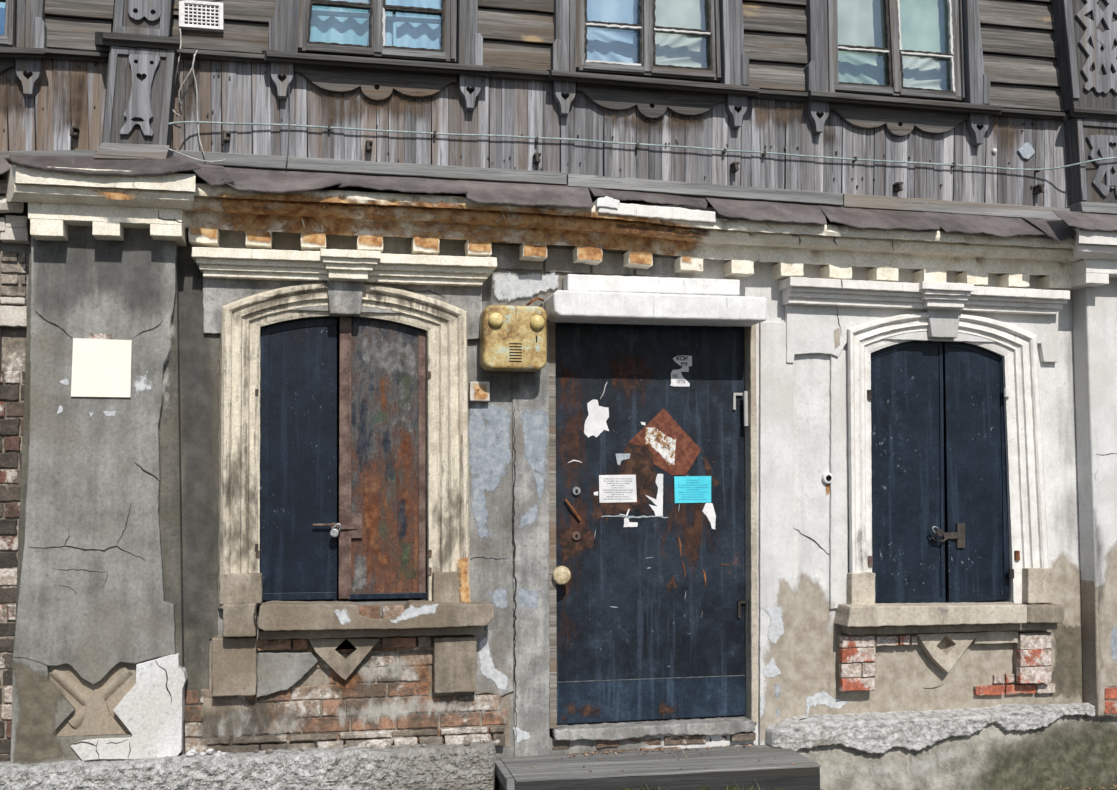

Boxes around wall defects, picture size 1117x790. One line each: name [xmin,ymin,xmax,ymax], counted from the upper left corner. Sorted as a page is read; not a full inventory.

rust [186,192,708,265]
peeling [468,403,549,539]
rust [558,374,719,561]
crack [30,504,145,594]
crack [471,410,517,738]
peeling [487,588,539,610]
peeling [763,606,784,643]
flaking render [11,628,530,764]
peeling [760,658,781,718]
peeling [805,690,847,716]